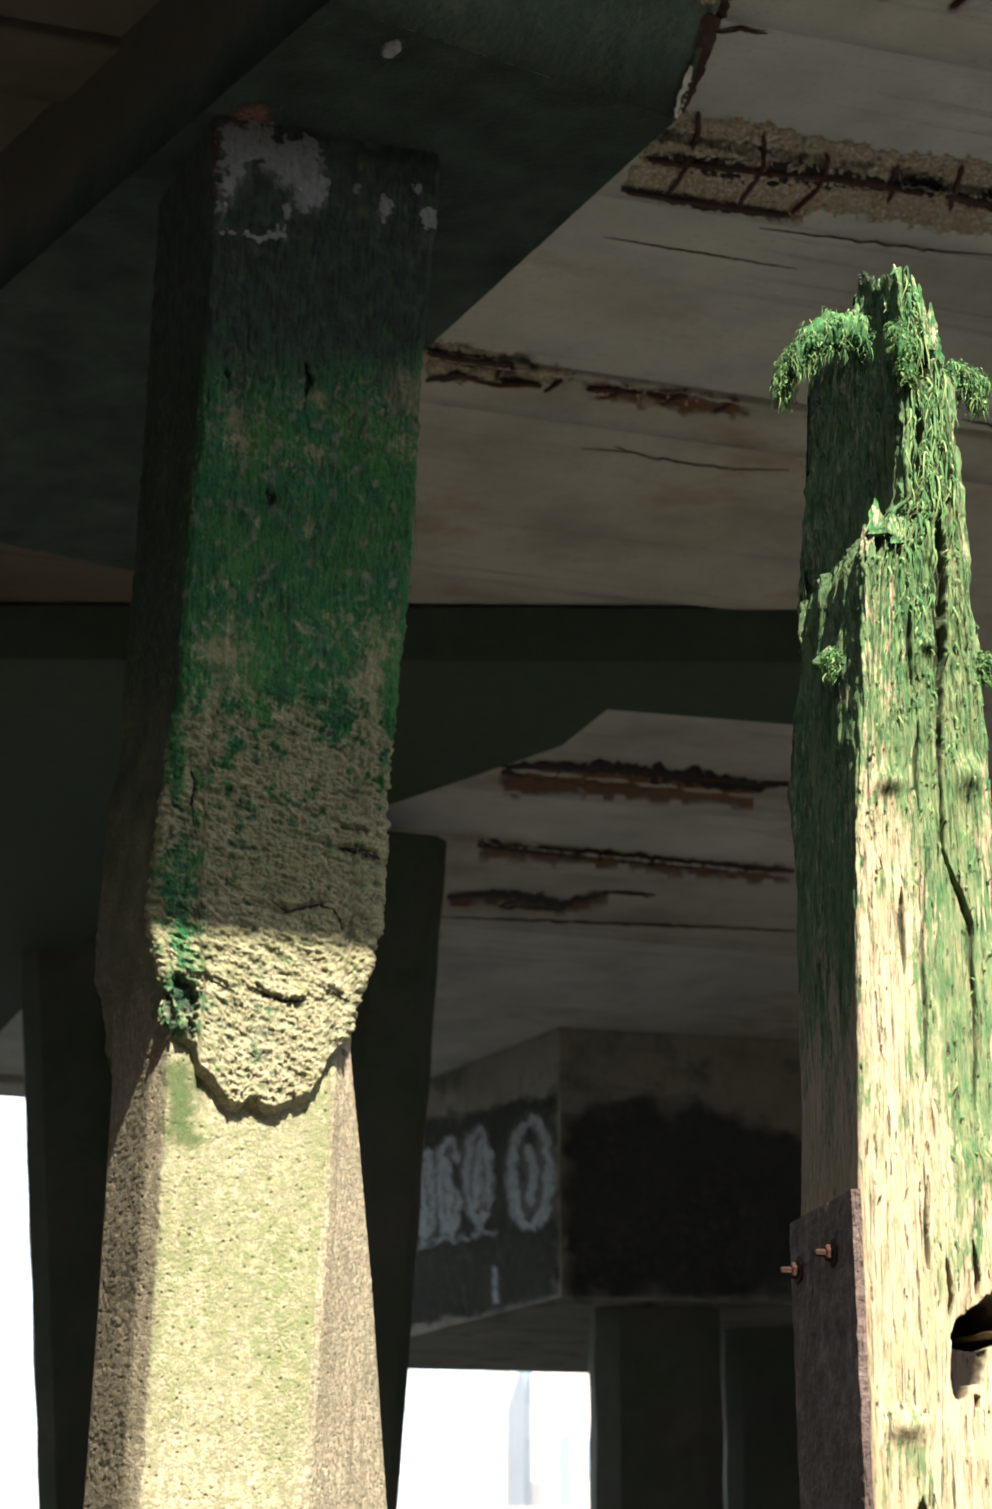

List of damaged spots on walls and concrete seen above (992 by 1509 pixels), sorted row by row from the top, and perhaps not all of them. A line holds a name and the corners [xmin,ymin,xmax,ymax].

peeling [212,120,332,244]
peeling [371,193,397,224]
peeling [411,183,437,232]
spalling [621,110,992,236]
spalling [425,341,745,418]
spalling [501,758,789,809]
spalling [477,838,795,884]
spalling [447,888,655,913]